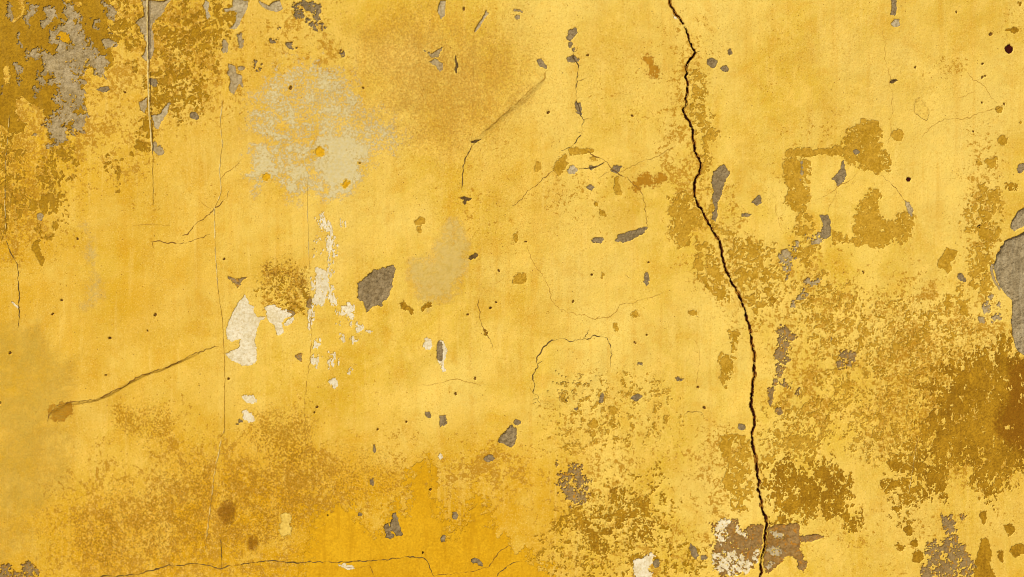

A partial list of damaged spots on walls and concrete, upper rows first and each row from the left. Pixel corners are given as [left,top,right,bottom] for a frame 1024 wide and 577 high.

peeling [0,0,327,266]
crack [47,108,520,577]
peeling [226,212,432,389]
crack [515,0,770,577]
peeling [530,49,1024,577]